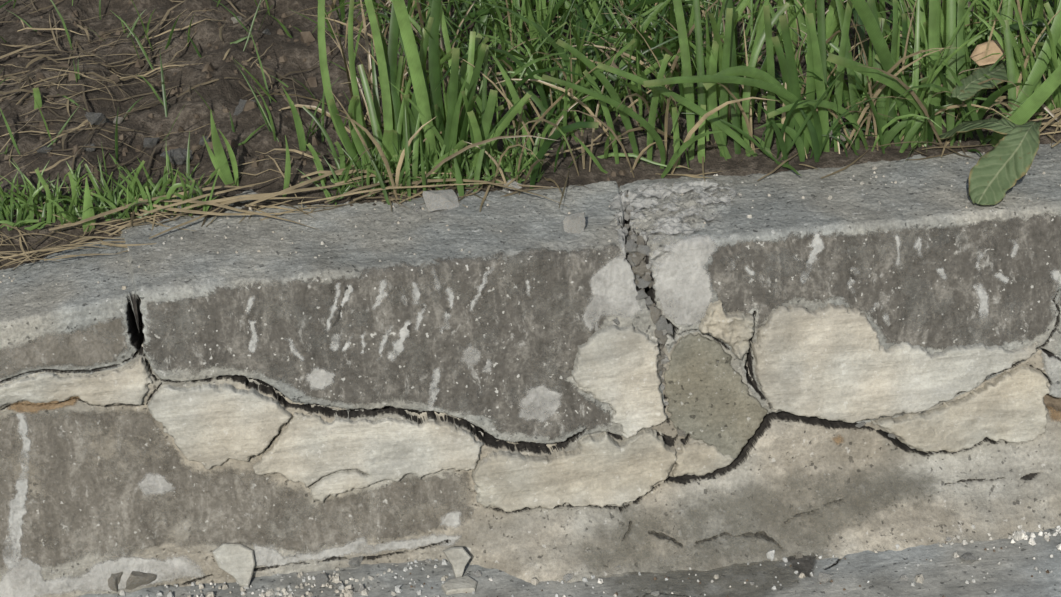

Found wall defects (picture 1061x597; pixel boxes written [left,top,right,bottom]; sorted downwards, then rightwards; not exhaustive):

crack [0,352,137,410]
crack [77,375,585,459]
peeling [0,180,1050,512]
crack [556,190,1007,547]
crack [957,291,1061,394]
damp [0,411,472,568]
crack [945,472,1040,485]